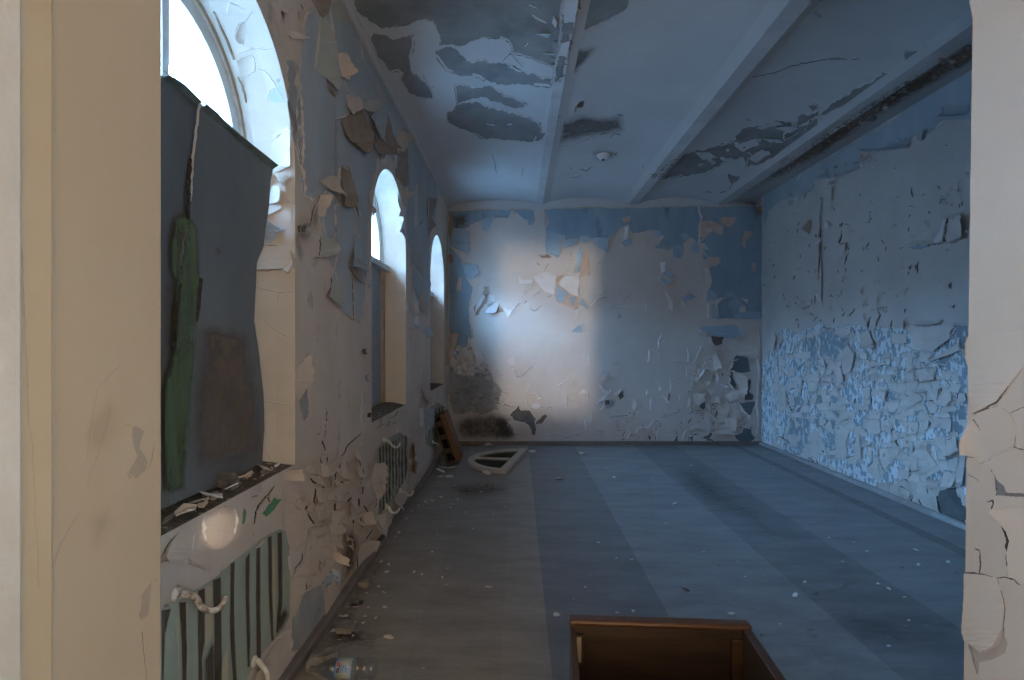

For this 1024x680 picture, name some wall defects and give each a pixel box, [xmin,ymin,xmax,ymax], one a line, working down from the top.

crack [752,58,859,78]
peeling [256,0,1024,675]
water stain [460,418,513,437]